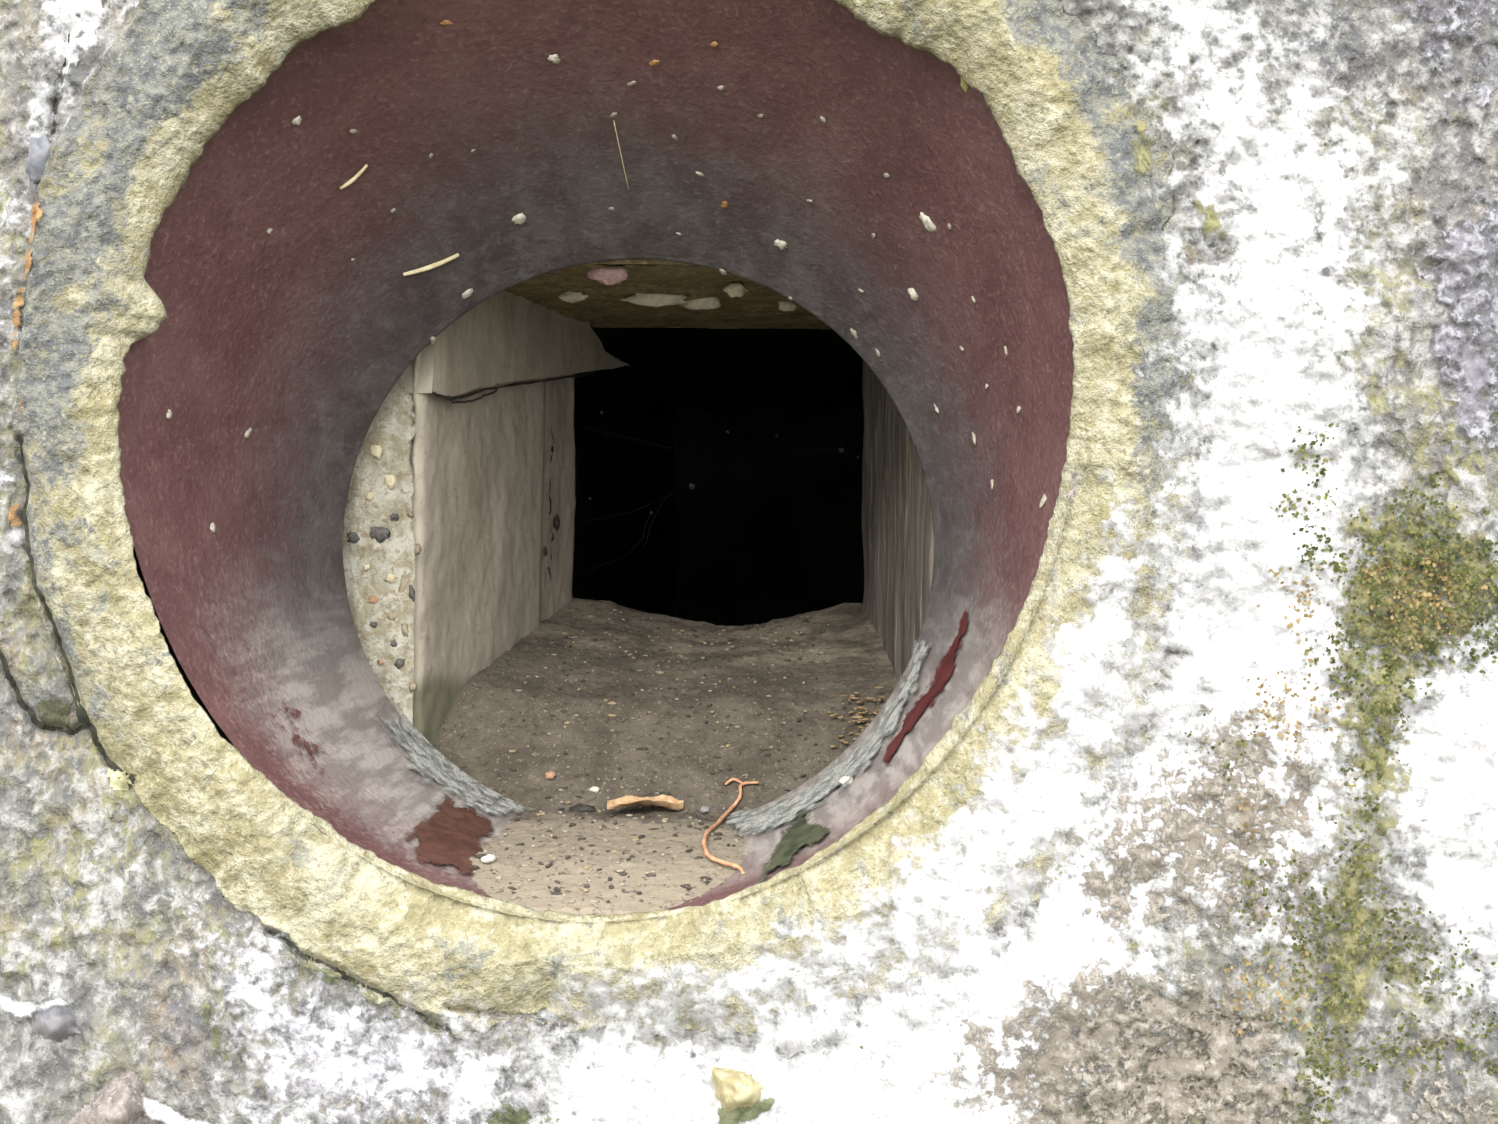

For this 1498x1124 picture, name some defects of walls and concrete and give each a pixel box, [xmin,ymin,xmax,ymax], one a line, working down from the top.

crack [50,33,70,134]
crack [0,440,133,784]